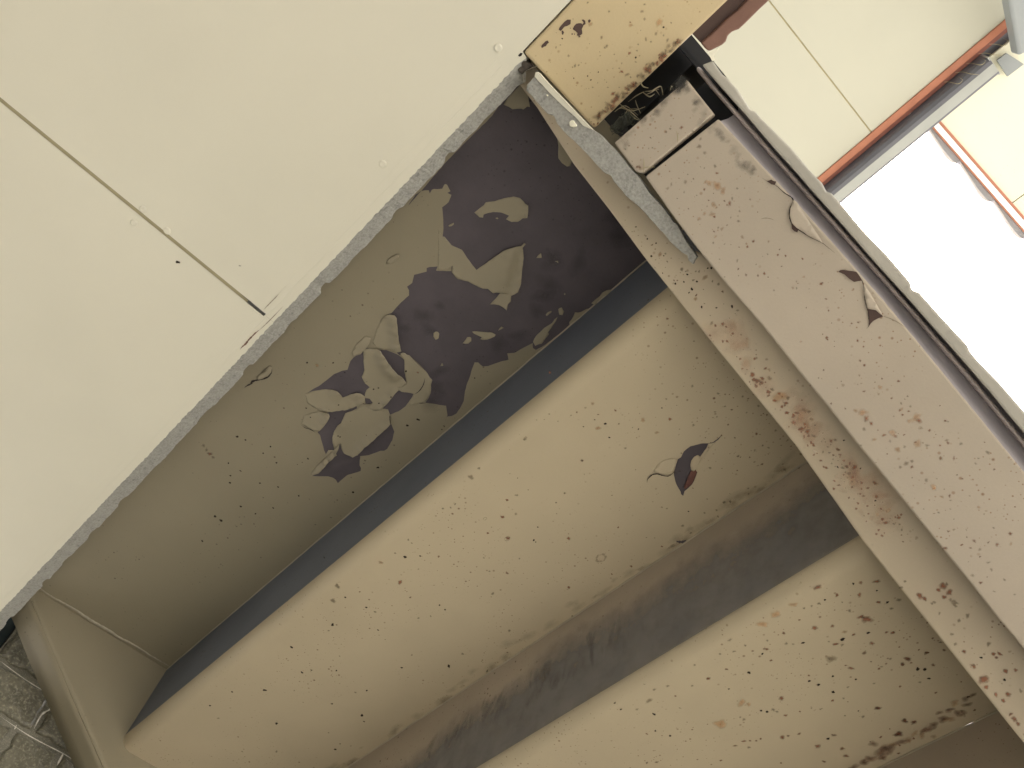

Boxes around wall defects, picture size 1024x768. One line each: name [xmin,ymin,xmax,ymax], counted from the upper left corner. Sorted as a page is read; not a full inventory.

peeling [0,58,698,630]
peeling [647,436,721,495]
corrosion [736,356,902,537]
corrosion [841,652,1020,768]